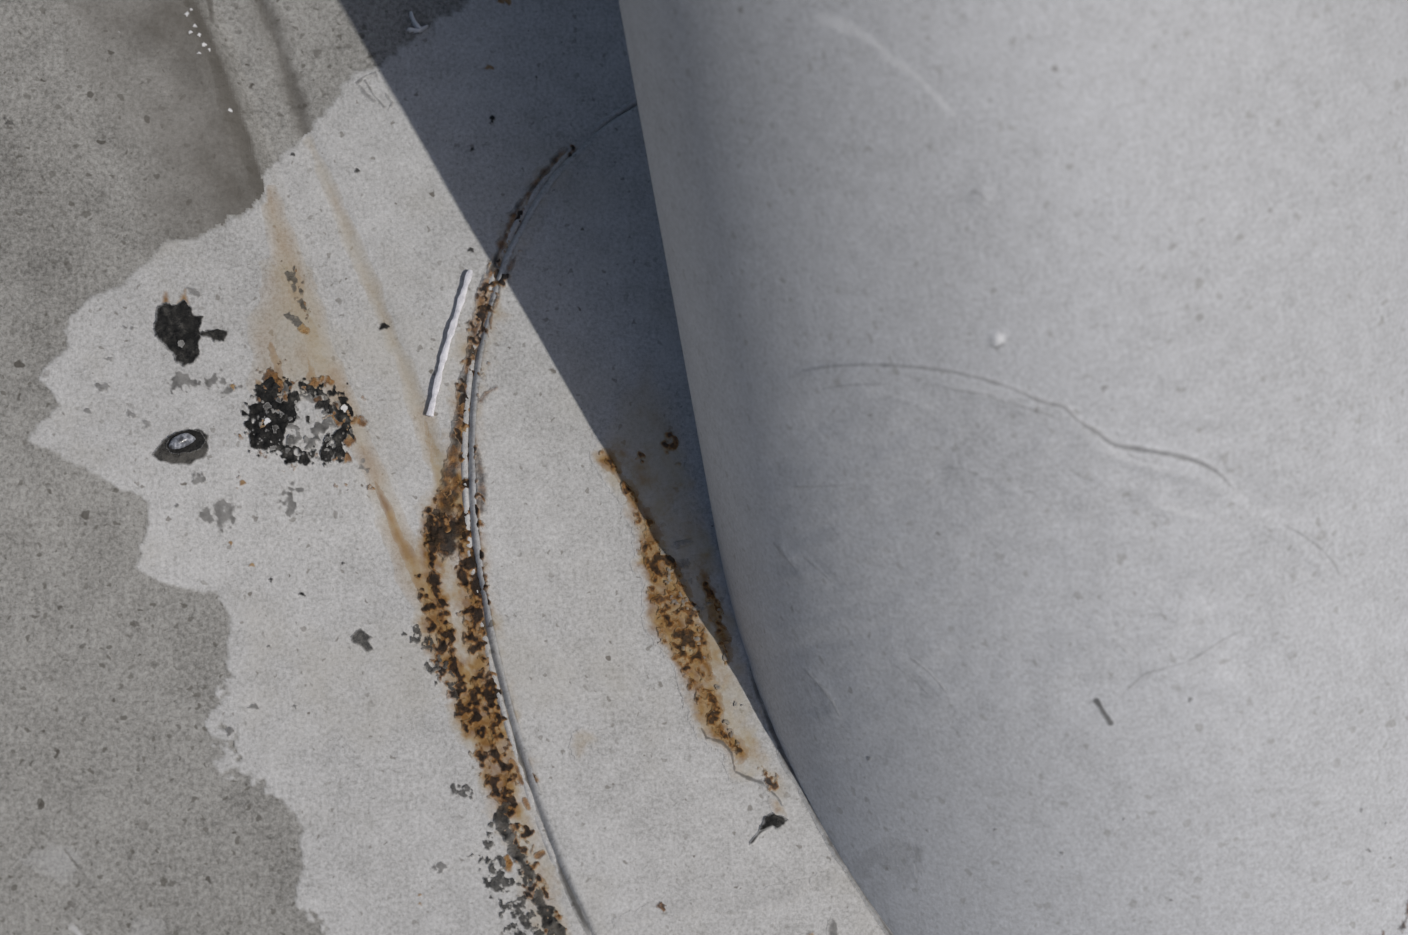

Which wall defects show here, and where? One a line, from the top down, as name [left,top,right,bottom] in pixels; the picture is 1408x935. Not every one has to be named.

peeling [406,11,429,33]
peeling [355,71,394,111]
peeling [283,265,310,335]
peeling [95,383,111,392]
spalling [153,286,375,518]
peeling [198,475,241,534]
corrosion [230,131,592,935]
corrosion [589,359,788,806]
spalling [350,628,374,653]
spalling [431,861,448,874]
peeling [806,918,839,935]